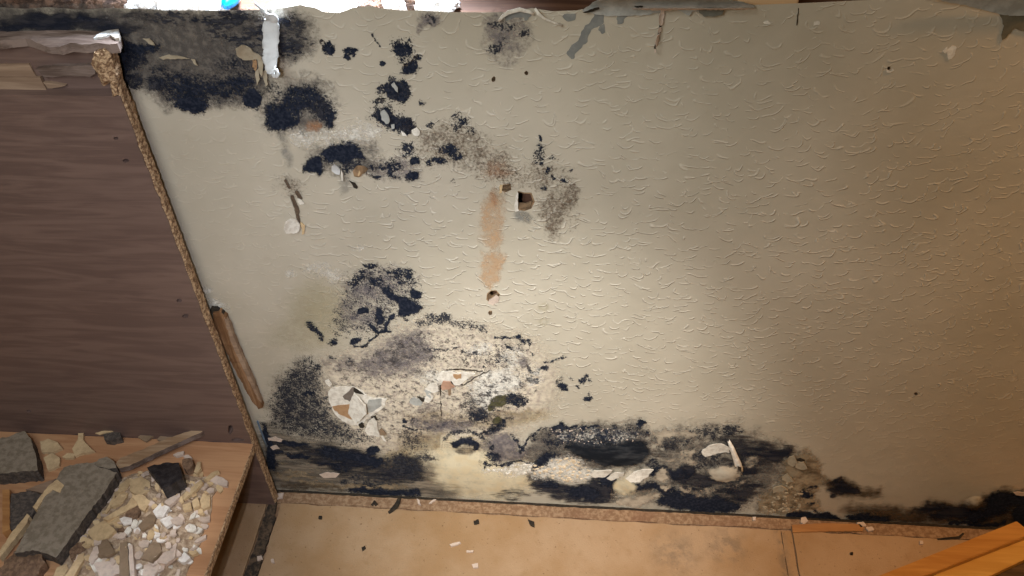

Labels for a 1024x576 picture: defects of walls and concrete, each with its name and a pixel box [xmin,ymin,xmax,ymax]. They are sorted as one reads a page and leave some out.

damp [0,3,529,184]
spalling [499,184,535,212]
damp [517,135,578,234]
spalling [325,379,387,442]
spalling [410,371,475,406]
damp [260,263,794,513]
spalling [482,455,654,495]
peeling [701,440,743,472]
damp [786,476,1024,527]